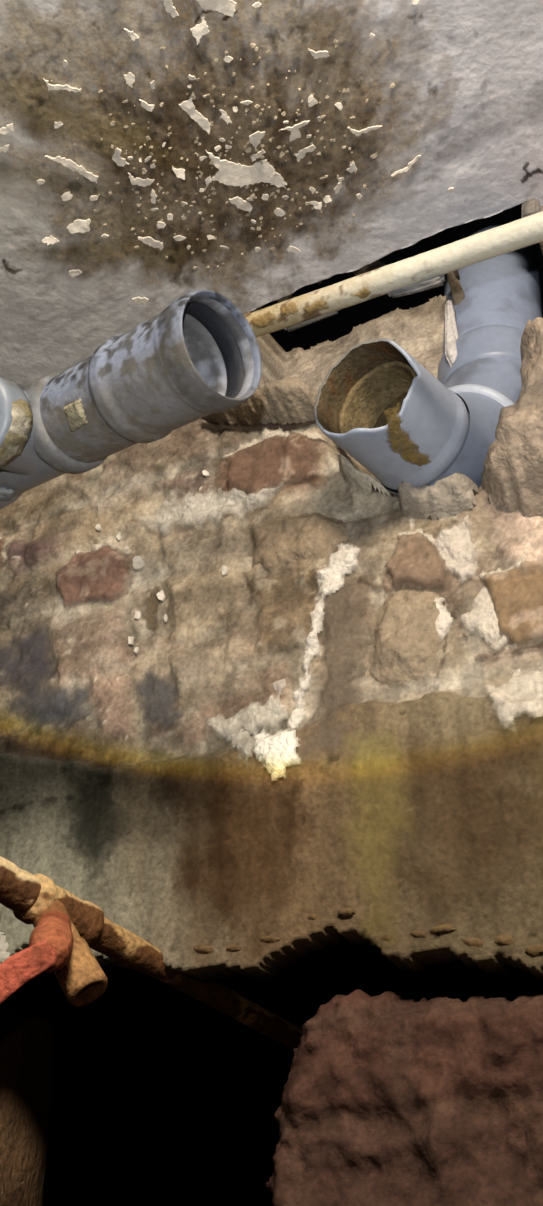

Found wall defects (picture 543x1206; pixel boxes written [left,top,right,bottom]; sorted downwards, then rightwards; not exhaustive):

peeling [190,0,236,45]
peeling [308,39,338,59]
leakage [0,0,418,292]
peeling [42,43,382,270]
peeling [391,155,421,176]
spalling [388,275,445,298]
spalling [445,300,459,368]
spalling [224,428,326,494]
spalling [56,524,145,604]
spalling [385,528,447,587]
spalling [134,588,168,630]
spalling [479,556,543,643]